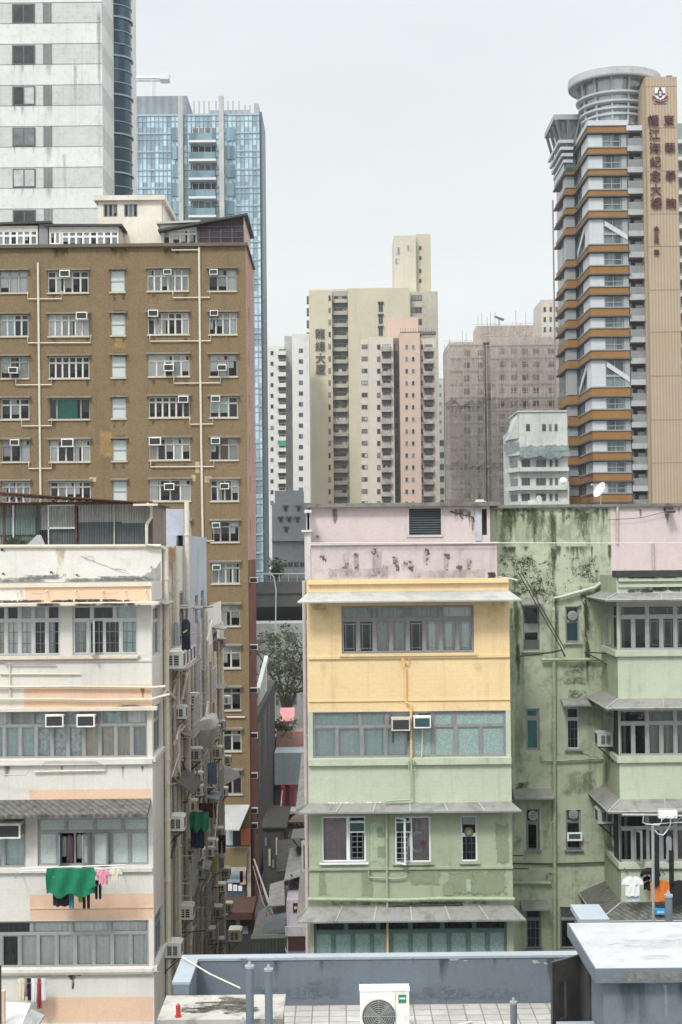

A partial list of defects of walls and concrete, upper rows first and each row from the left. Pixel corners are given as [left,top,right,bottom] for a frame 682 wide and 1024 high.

water stain [496,508,608,574]
crack [80,556,128,596]